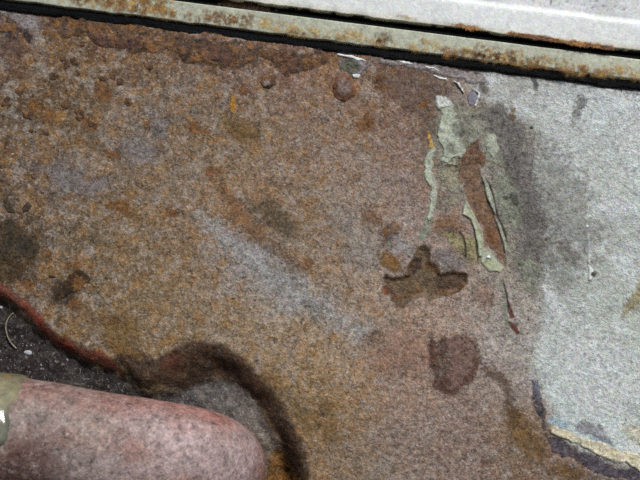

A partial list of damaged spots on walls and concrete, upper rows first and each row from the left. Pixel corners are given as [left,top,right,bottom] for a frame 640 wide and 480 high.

corrosion [73,0,176,16]
corrosion [43,16,336,77]
corrosion [184,10,254,26]
corrosion [261,18,393,46]
corrosion [409,41,640,79]
corrosion [94,73,124,105]
corrosion [356,113,375,131]
peeling [337,54,526,308]
corrosion [0,198,53,290]
leakage [325,205,414,273]
corrosion [48,260,95,310]
leakage [106,341,309,480]